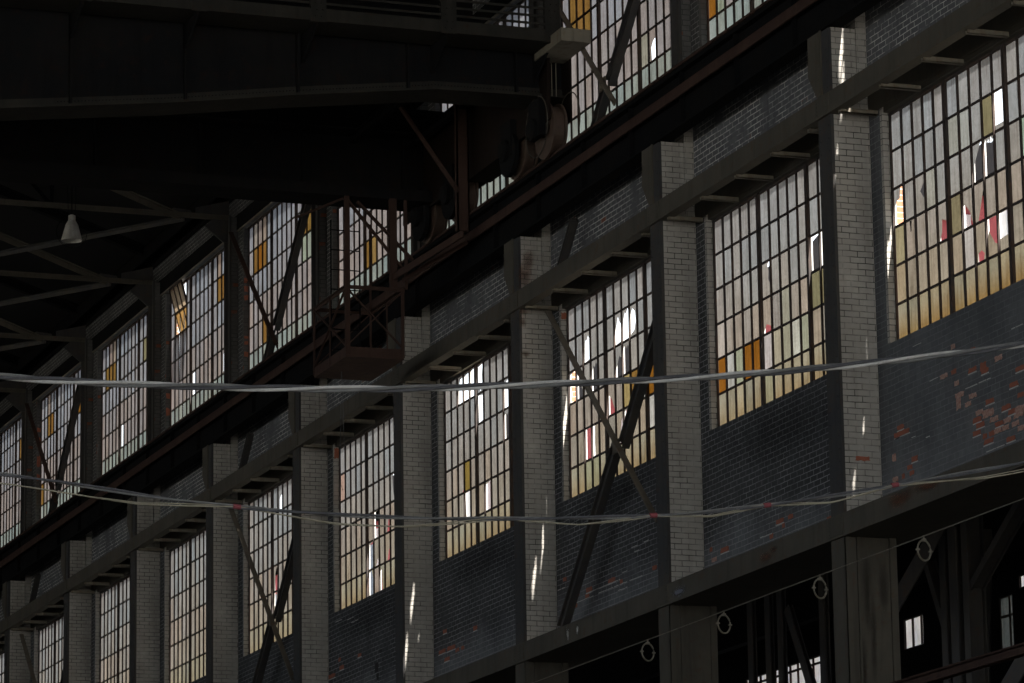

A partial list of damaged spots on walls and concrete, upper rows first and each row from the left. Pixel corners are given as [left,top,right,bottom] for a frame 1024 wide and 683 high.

peeling [940,352,1024,447]